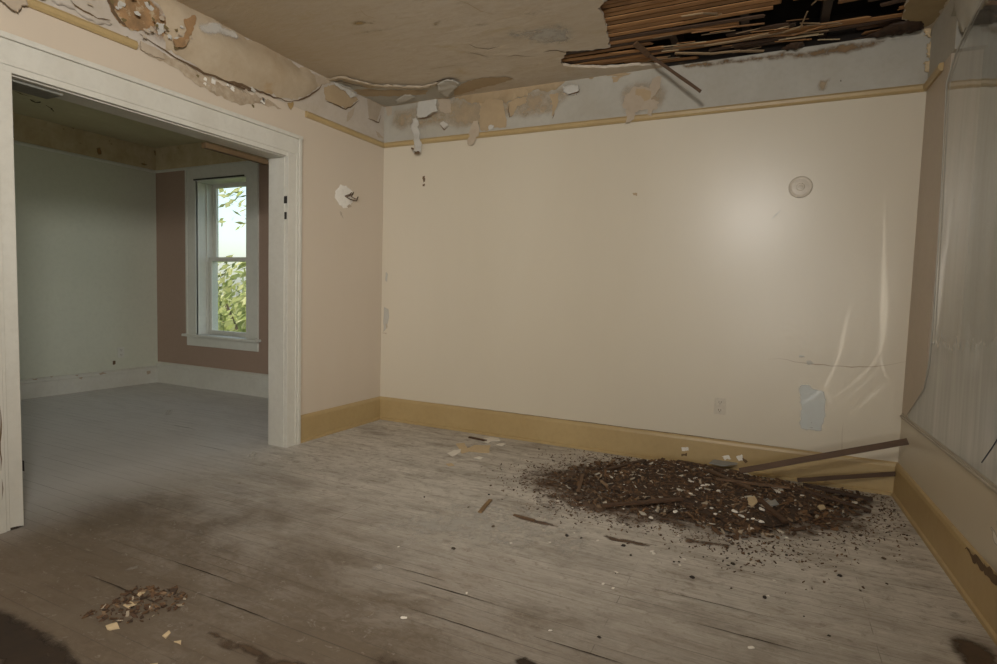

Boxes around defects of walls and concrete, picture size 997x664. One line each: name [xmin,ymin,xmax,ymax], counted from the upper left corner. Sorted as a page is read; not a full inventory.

peeling [51,0,281,109]
peeling [902,0,947,72]
peeling [315,74,513,154]
spalling [335,184,358,208]